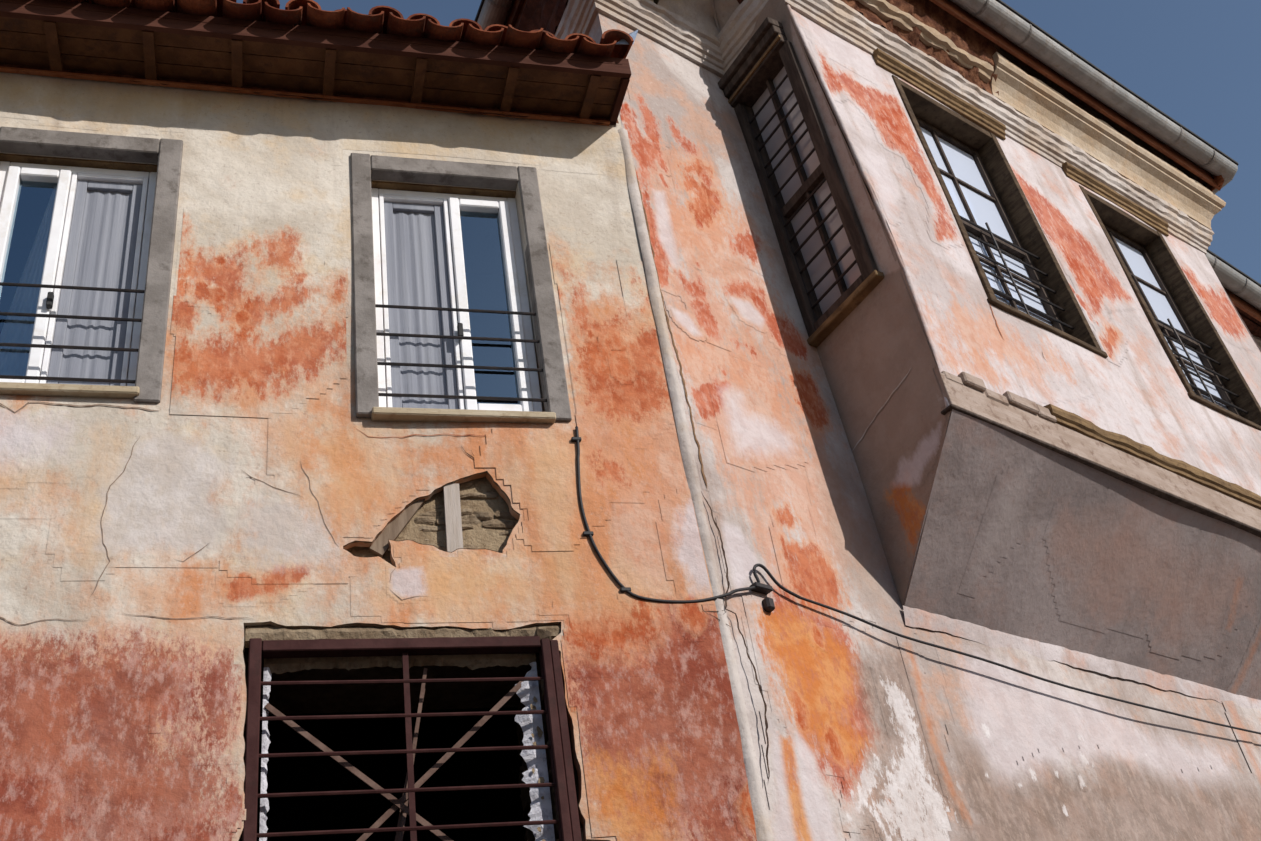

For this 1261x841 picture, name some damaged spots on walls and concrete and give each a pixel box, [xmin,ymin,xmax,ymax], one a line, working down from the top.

peeling [808,41,964,250]
crack [0,402,159,625]
crack [124,612,254,620]
crack [242,464,337,545]
peeling [0,85,952,841]
crack [634,165,770,781]
water stain [803,273,1261,841]